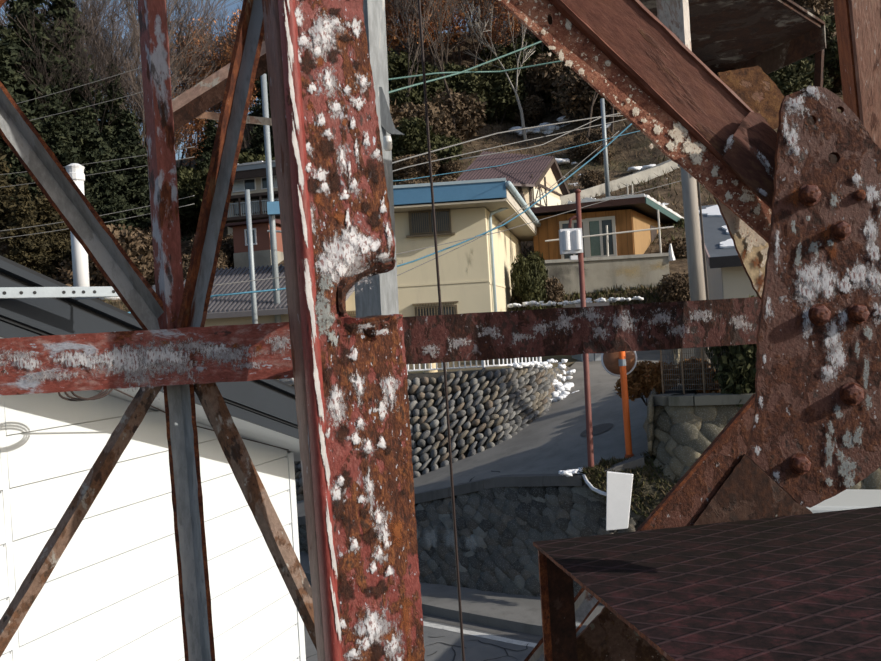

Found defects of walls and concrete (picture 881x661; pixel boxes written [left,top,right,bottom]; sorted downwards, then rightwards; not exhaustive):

rust [300,35,355,75]
peeling [782,86,827,160]
rust [307,173,341,204]
peeling [852,170,881,206]
peeling [282,0,405,661]
peeling [788,216,881,410]
peeling [0,334,290,405]
rust [324,344,353,385]
rust [335,423,349,446]
rust [333,467,353,529]
rust [337,573,388,602]
rust [370,598,414,661]